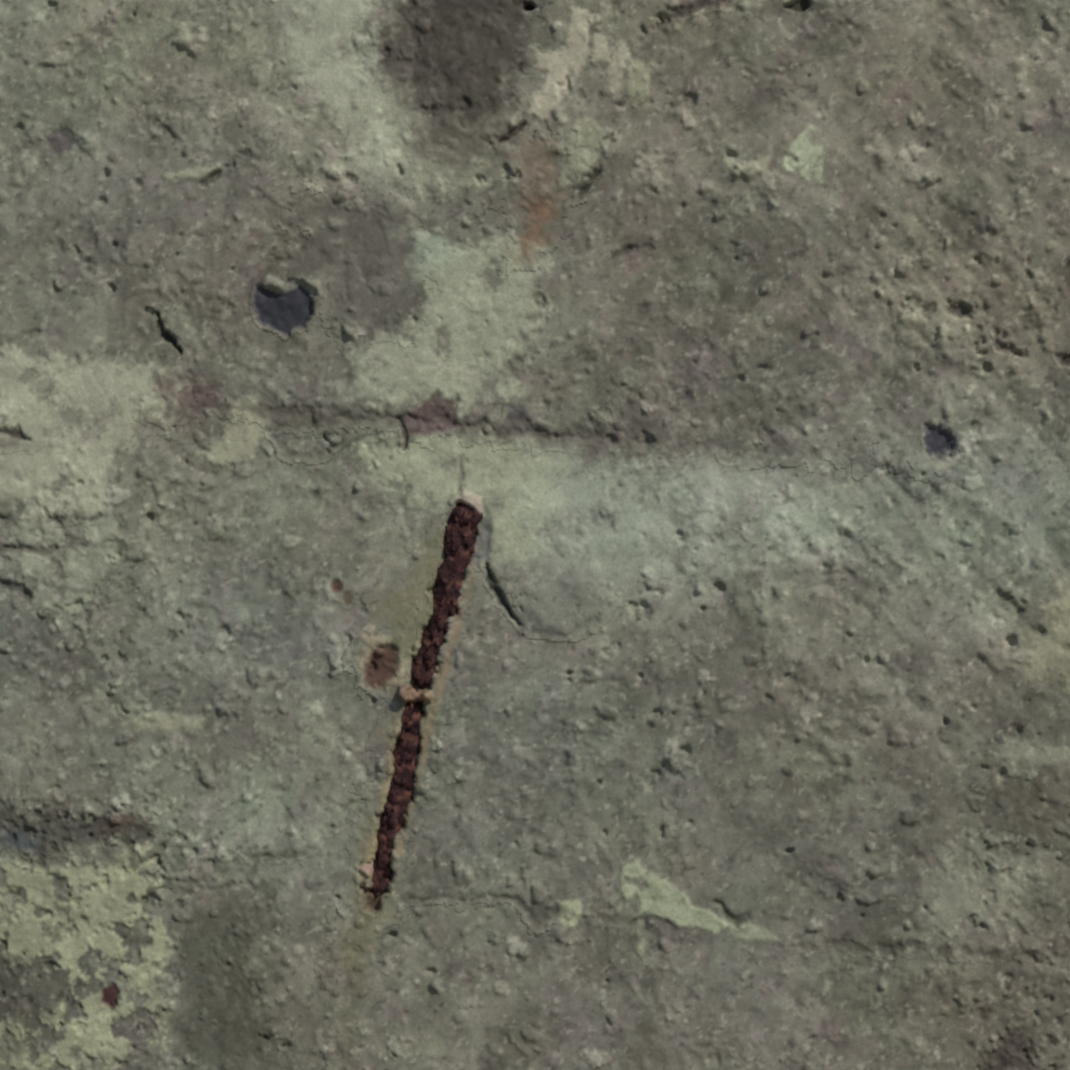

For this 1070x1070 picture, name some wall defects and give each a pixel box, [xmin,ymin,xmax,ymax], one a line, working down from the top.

peeling [530,4,653,127]
crack [646,0,735,34]
crack [780,0,813,14]
peeling [246,0,563,419]
water stain [274,0,565,355]
peeling [561,114,608,181]
crack [151,308,184,356]
peeling [189,422,270,471]
crack [133,378,947,531]
crack [482,558,519,629]
peeling [343,427,770,918]
rust [314,498,483,1070]